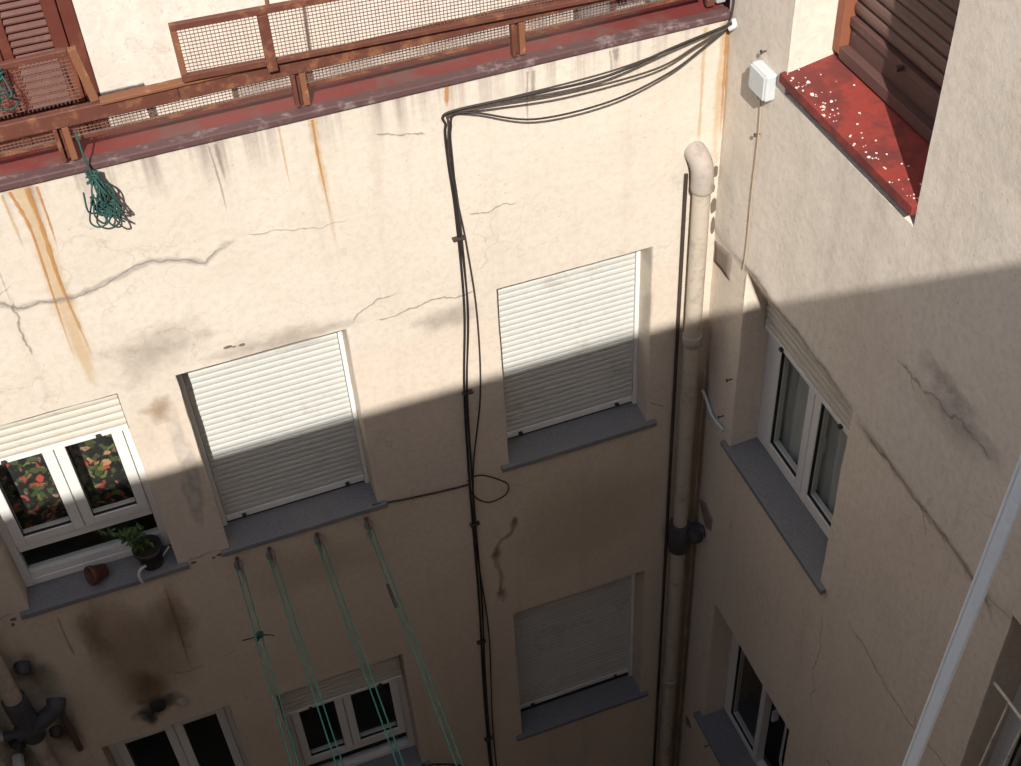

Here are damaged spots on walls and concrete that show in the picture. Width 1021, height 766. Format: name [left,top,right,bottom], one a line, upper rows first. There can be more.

peeling [787,69,839,122]
corrosion [8,186,72,310]